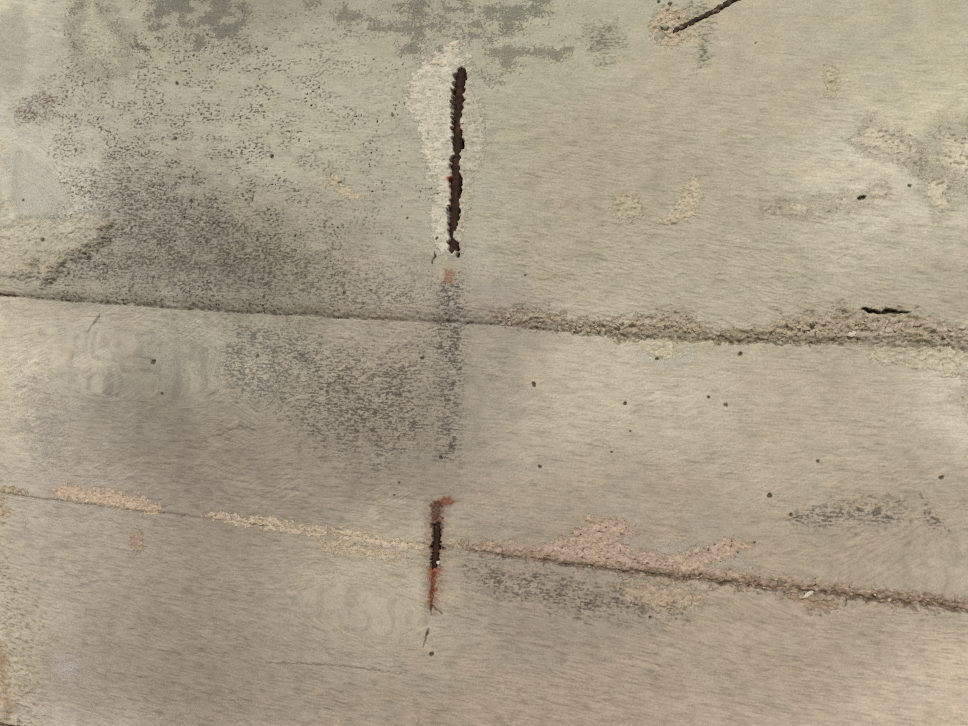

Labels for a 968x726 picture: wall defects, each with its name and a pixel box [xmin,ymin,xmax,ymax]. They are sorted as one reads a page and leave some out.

spalling [648,0,738,50]
spalling [303,0,586,261]
rust [428,497,454,605]
spalling [200,509,968,616]